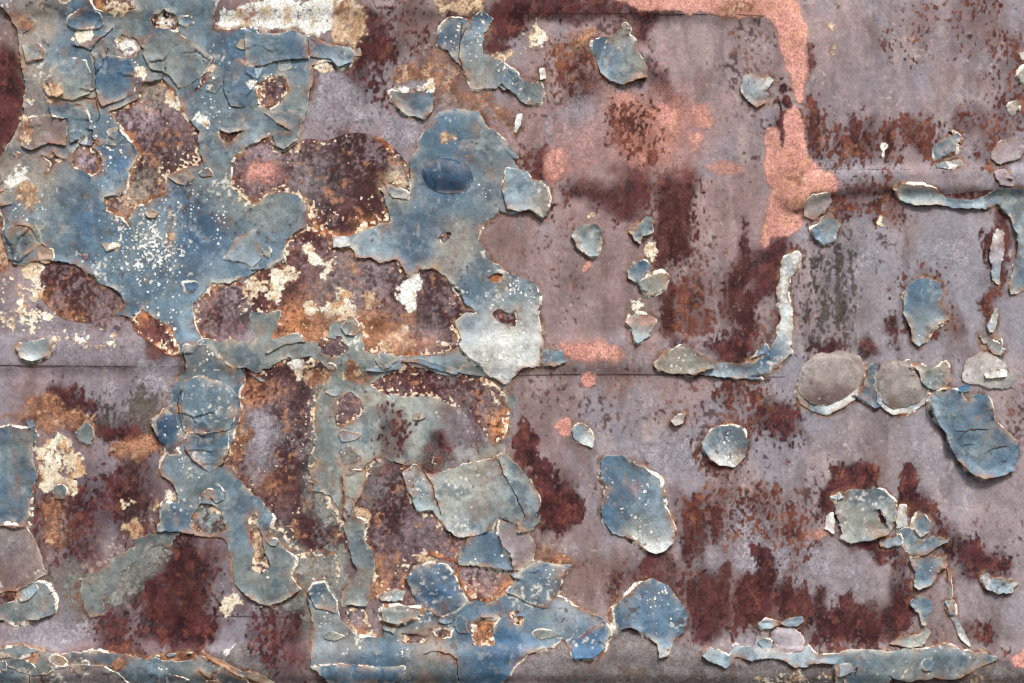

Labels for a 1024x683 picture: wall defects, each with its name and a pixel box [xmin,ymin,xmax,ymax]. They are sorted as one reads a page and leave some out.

rust [484,0,830,364]
rust [769,0,1024,237]
peeling [892,137,1024,296]
rust [0,375,307,683]
peeling [0,0,688,683]
rust [423,398,586,568]
peeling [652,250,802,382]
rust [607,374,916,654]
peeling [700,486,998,683]
peeling [794,360,1021,482]
rust [894,462,1013,580]
rust [967,619,1011,658]